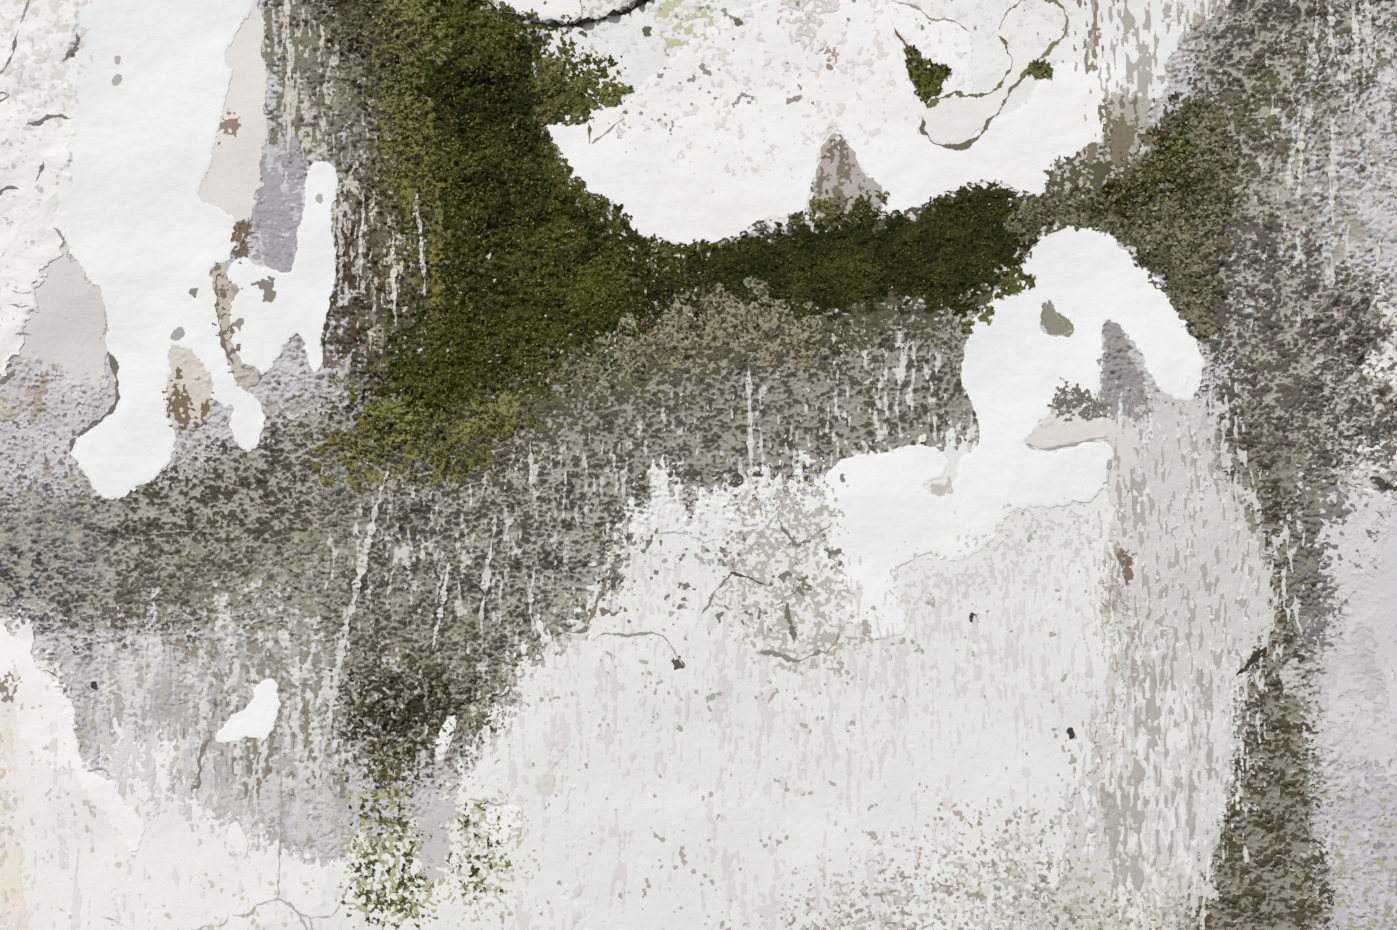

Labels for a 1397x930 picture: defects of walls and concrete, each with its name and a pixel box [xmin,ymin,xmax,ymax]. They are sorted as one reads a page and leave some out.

peeling [0,0,110,404]
leakage [251,135,307,273]
peeling [189,0,434,391]
leakage [321,28,461,406]
crack [536,0,650,28]
peeling [541,0,768,110]
spalling [765,129,901,229]
leakage [810,134,865,213]
leakage [1051,95,1140,184]
peeling [1252,0,1397,389]
peeling [0,319,1397,930]
leakage [534,464,1233,930]